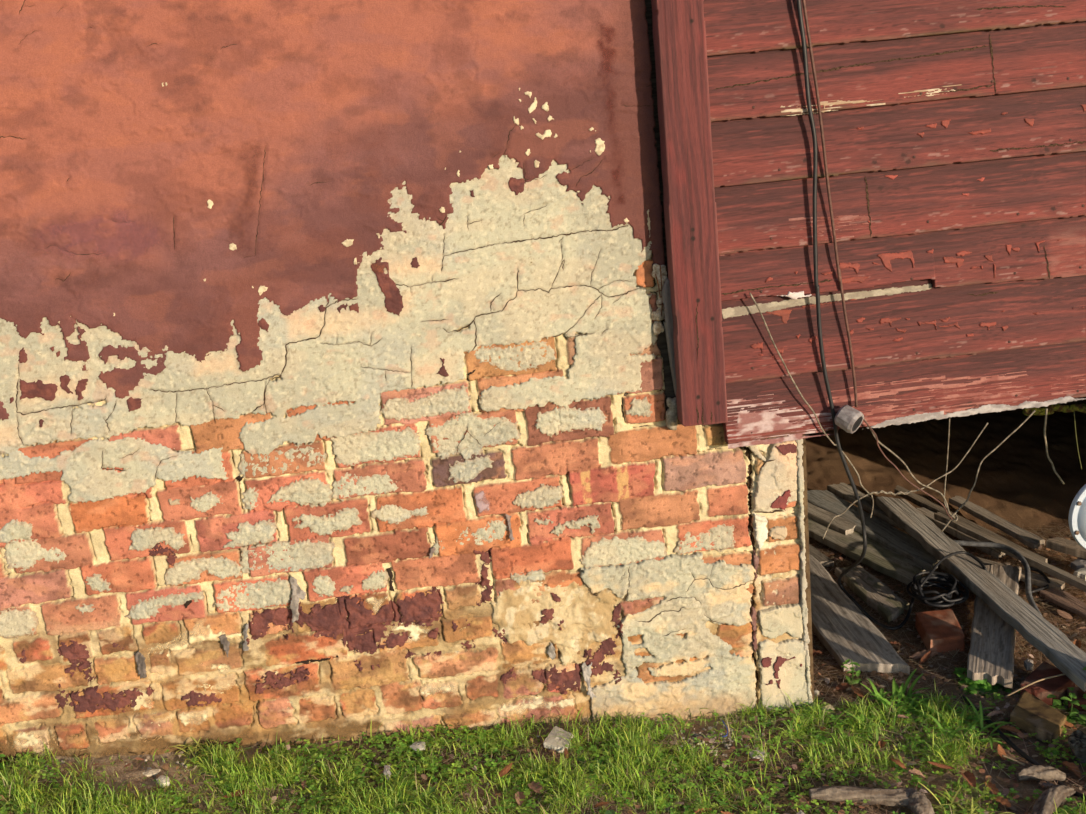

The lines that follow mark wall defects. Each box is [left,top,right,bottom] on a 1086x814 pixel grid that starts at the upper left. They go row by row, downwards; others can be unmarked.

peeling [513,88,557,140]
crack [494,125,602,186]
peeling [588,127,605,155]
peeling [780,100,885,116]
crack [395,205,640,349]
peeling [722,251,932,323]
peeling [0,149,668,671]
crack [619,448,783,699]
flaking render [429,371,1086,724]
peeling [54,640,155,713]
peeling [181,690,222,707]
peeling [255,666,310,694]